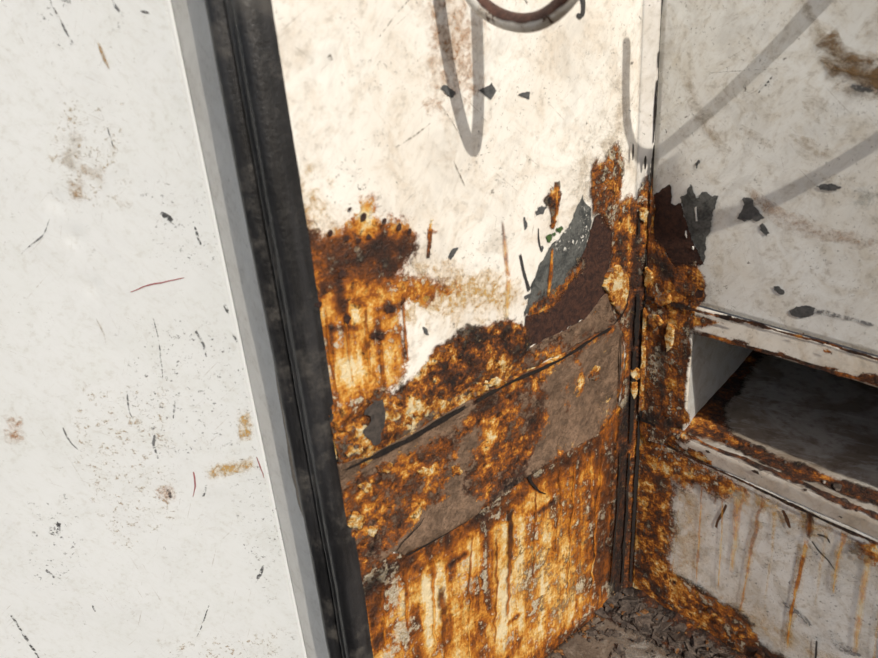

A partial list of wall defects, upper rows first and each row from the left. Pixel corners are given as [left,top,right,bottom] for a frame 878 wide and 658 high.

corrosion [308,196,543,469]
corrosion [362,142,878,658]